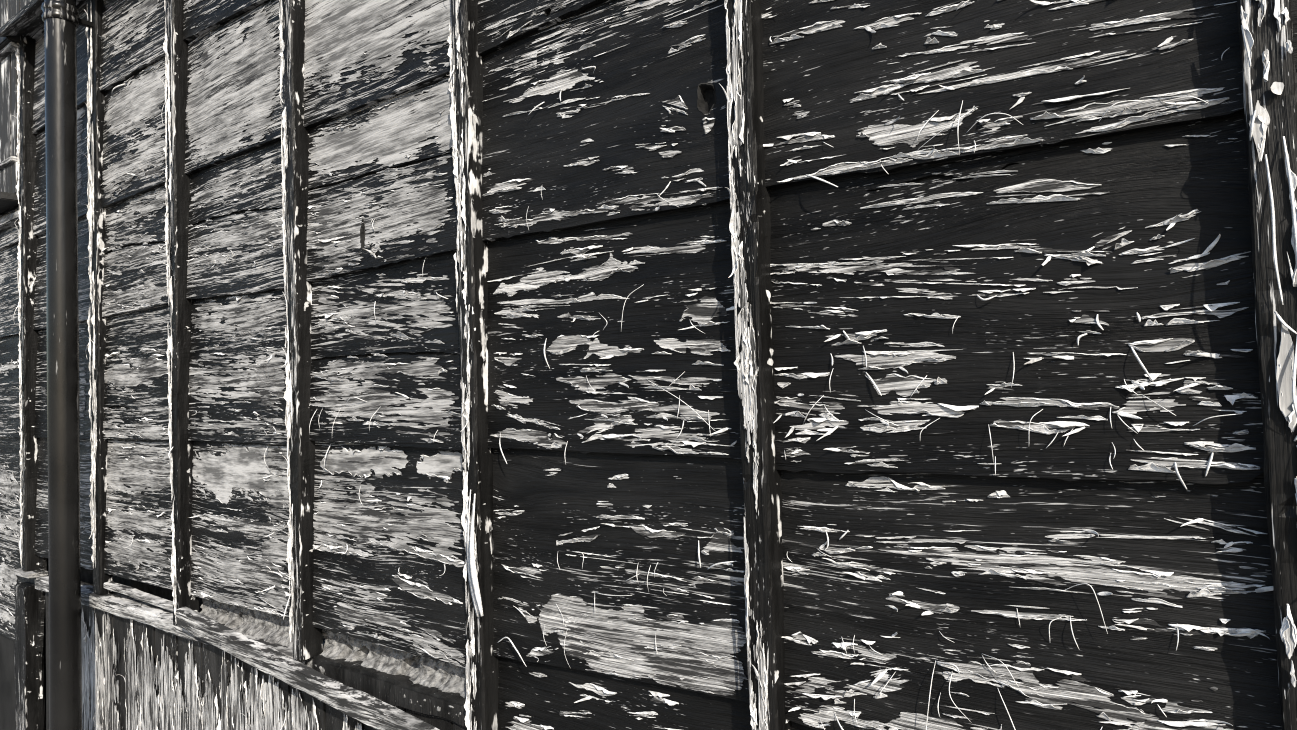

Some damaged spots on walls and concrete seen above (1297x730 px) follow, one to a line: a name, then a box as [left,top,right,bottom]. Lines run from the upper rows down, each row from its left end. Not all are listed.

peeling [77,0,294,643]
peeling [304,0,768,730]
peeling [763,0,1297,447]
peeling [782,631,1246,730]
peeling [783,516,1297,687]